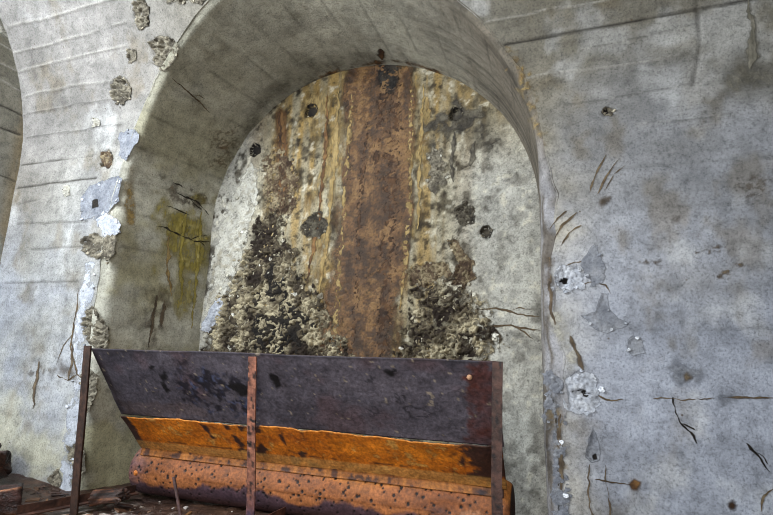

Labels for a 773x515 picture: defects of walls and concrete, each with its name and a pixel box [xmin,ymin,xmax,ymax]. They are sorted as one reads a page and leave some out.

crack [57,289,81,380]
peeling [47,129,139,491]
spalling [109,75,132,107]
spalling [131,0,150,31]
spalling [147,35,179,71]
leakage [148,182,209,347]
leakage [303,63,348,301]
rust [319,65,417,357]
leakage [368,49,501,235]
peeling [541,369,623,515]
crack [654,394,772,402]